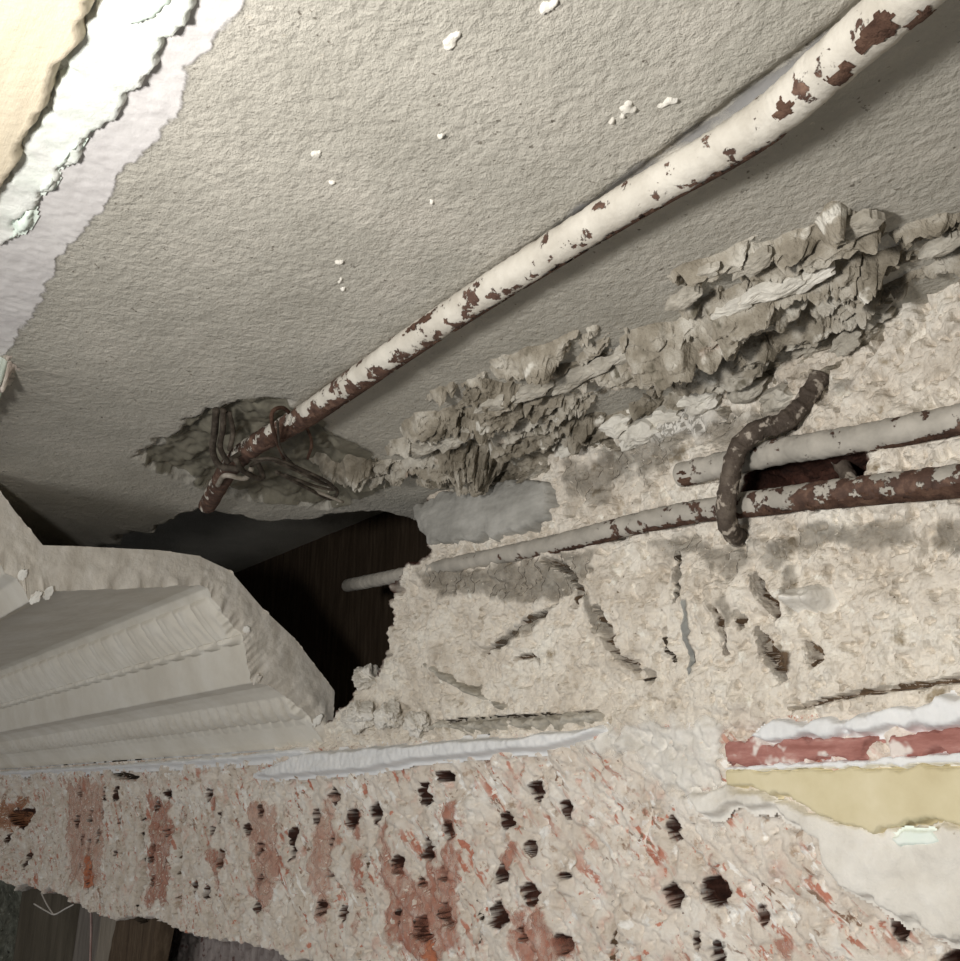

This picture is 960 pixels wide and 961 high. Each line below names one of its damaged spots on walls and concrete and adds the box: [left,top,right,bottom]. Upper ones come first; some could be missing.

peeling [539,0,559,16]
corrosion [854,5,937,55]
corrosion [822,60,856,86]
peeling [608,100,637,125]
corrosion [771,96,795,121]
flaking render [0,0,244,393]
corrosion [451,133,787,332]
spalling [309,201,960,497]
corrosion [870,432,960,451]
corrosion [736,483,960,519]
peeling [725,690,960,847]
spalling [379,820,461,961]